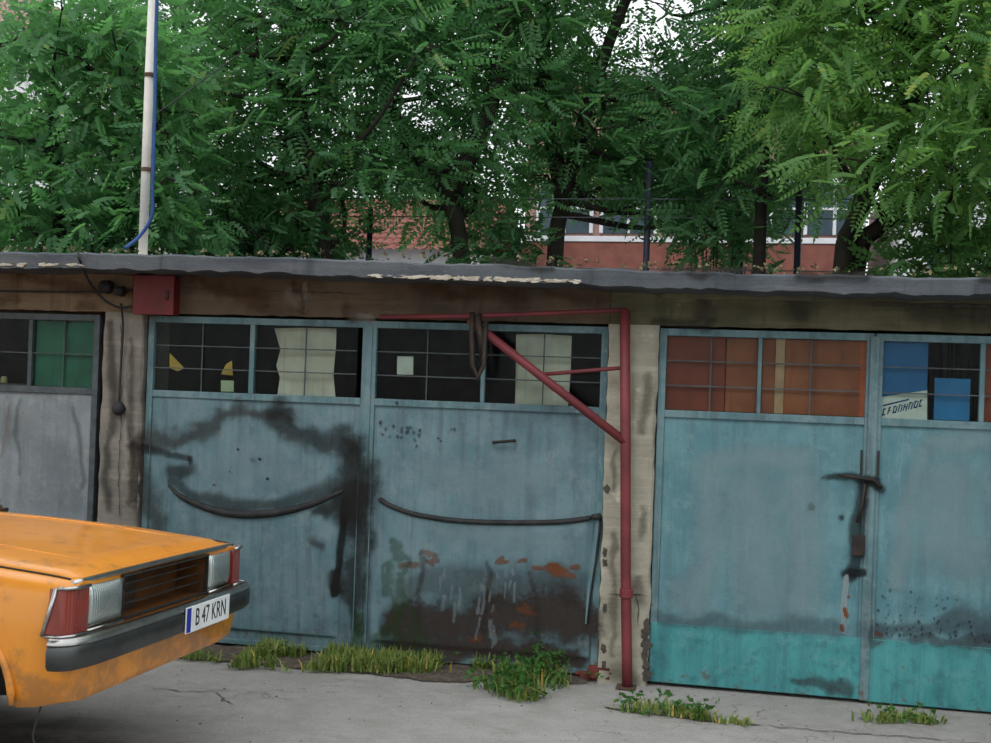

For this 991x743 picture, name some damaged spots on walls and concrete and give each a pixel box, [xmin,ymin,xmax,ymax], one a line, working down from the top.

spalling [368,274,582,284]
corrosion [495,556,579,578]